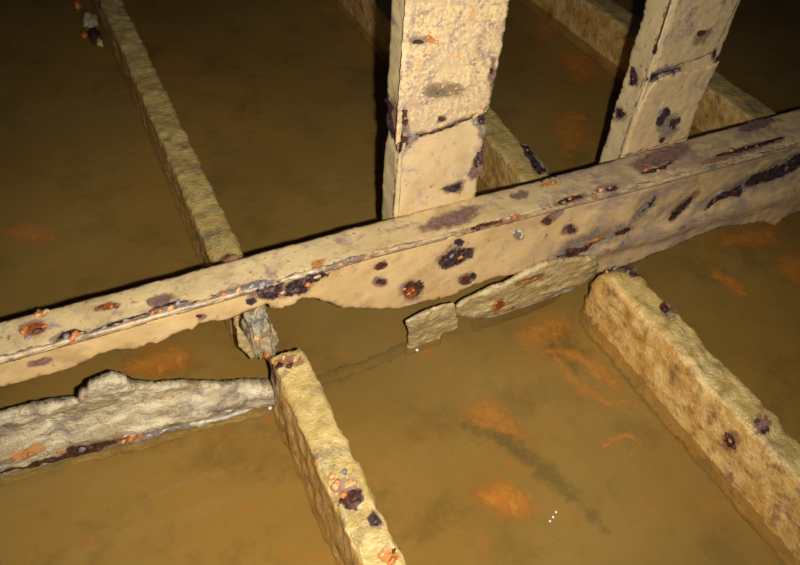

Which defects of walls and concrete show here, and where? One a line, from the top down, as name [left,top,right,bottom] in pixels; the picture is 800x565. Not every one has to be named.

corrosion [385,94,419,153]
corrosion [629,107,688,174]
corrosion [443,148,483,193]
corrosion [213,251,387,306]
spalling [373,260,388,287]
spalling [403,281,424,297]
corrosion [19,309,50,340]
corrosion [49,293,192,343]
corrosion [0,421,197,474]
corrosion [722,431,739,450]
corrosion [328,468,364,511]
corrosion [366,511,384,529]